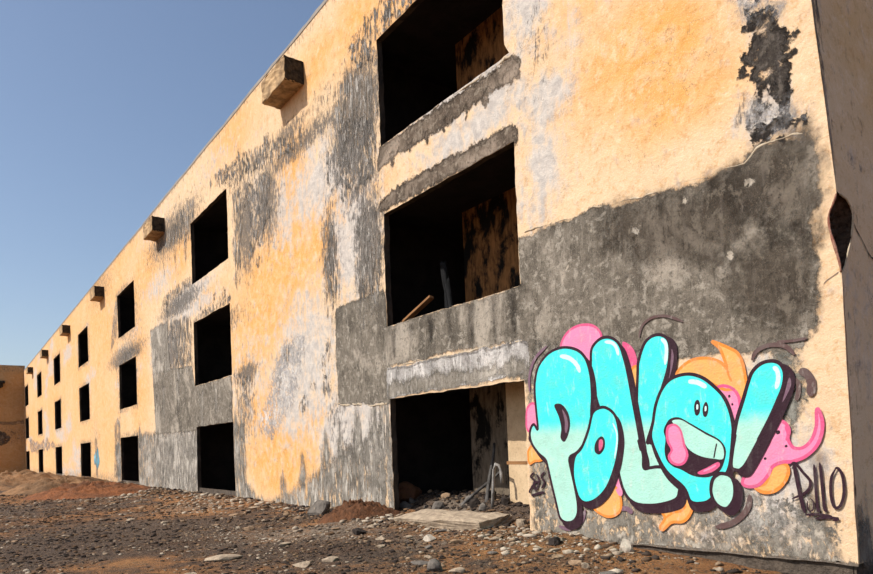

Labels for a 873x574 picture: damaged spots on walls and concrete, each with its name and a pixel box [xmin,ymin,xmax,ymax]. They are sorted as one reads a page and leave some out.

water stain [162,187,243,390]
water stain [323,220,340,321]
flaking render [299,0,854,413]
water stain [134,429,198,491]